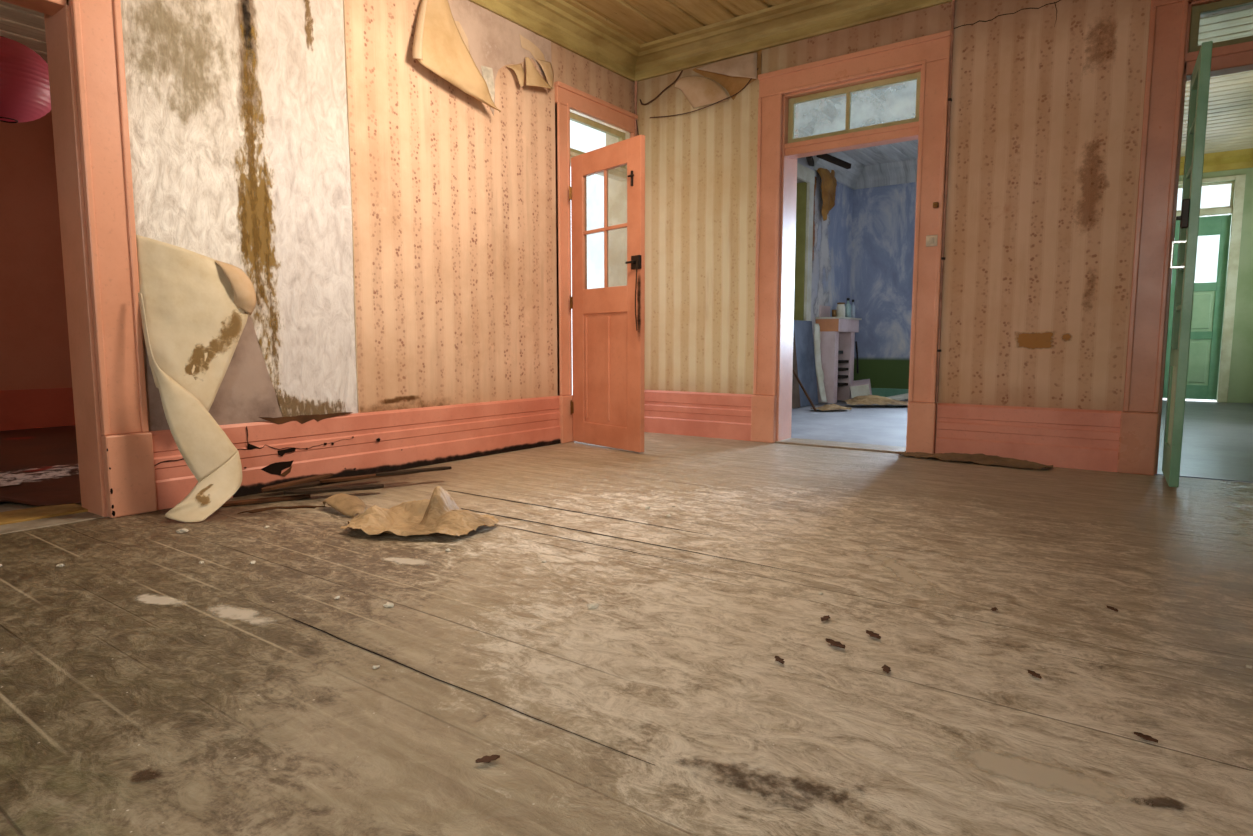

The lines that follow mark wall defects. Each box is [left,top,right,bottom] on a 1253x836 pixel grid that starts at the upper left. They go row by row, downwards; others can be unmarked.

leakage [136,0,210,120]
leakage [238,0,260,118]
flaking render [412,0,554,115]
peeling [692,50,762,100]
flaking render [120,0,359,523]
leakage [275,387,345,417]